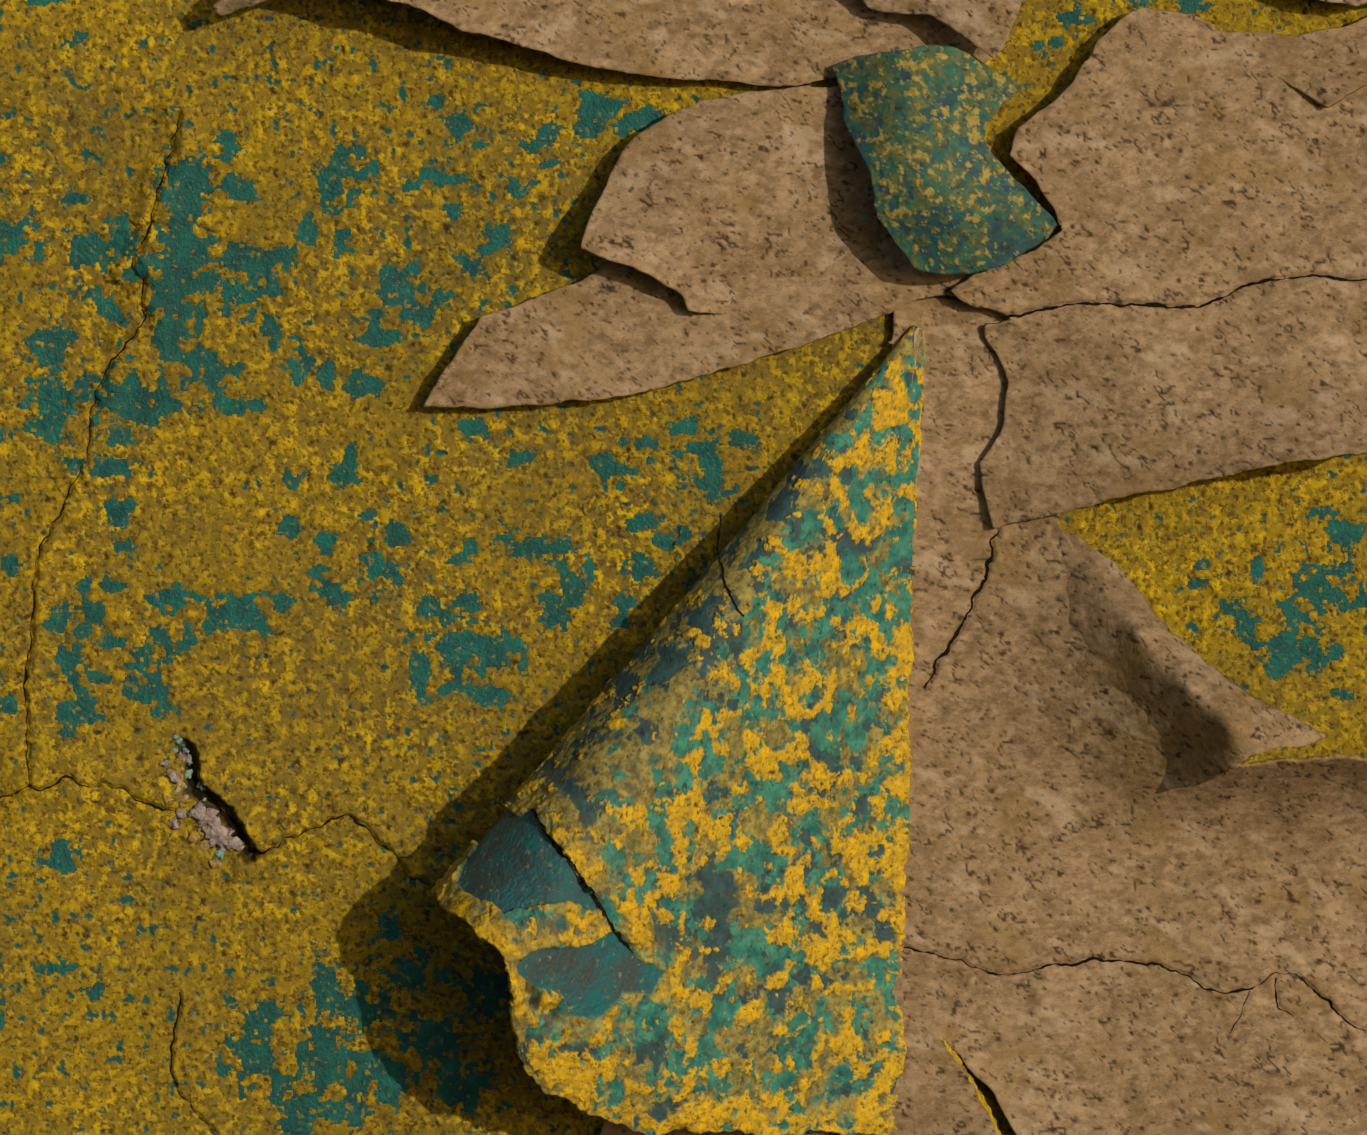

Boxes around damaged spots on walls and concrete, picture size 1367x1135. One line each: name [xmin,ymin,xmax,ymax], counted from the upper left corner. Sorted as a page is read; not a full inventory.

peeling [212,0,268,16]
spalling [352,259,456,348]
crack [1001,274,1367,318]
crack [0,114,180,812]
peeling [387,0,1367,1135]
crack [924,531,999,688]
crack [251,814,432,889]
crack [903,947,1367,1034]